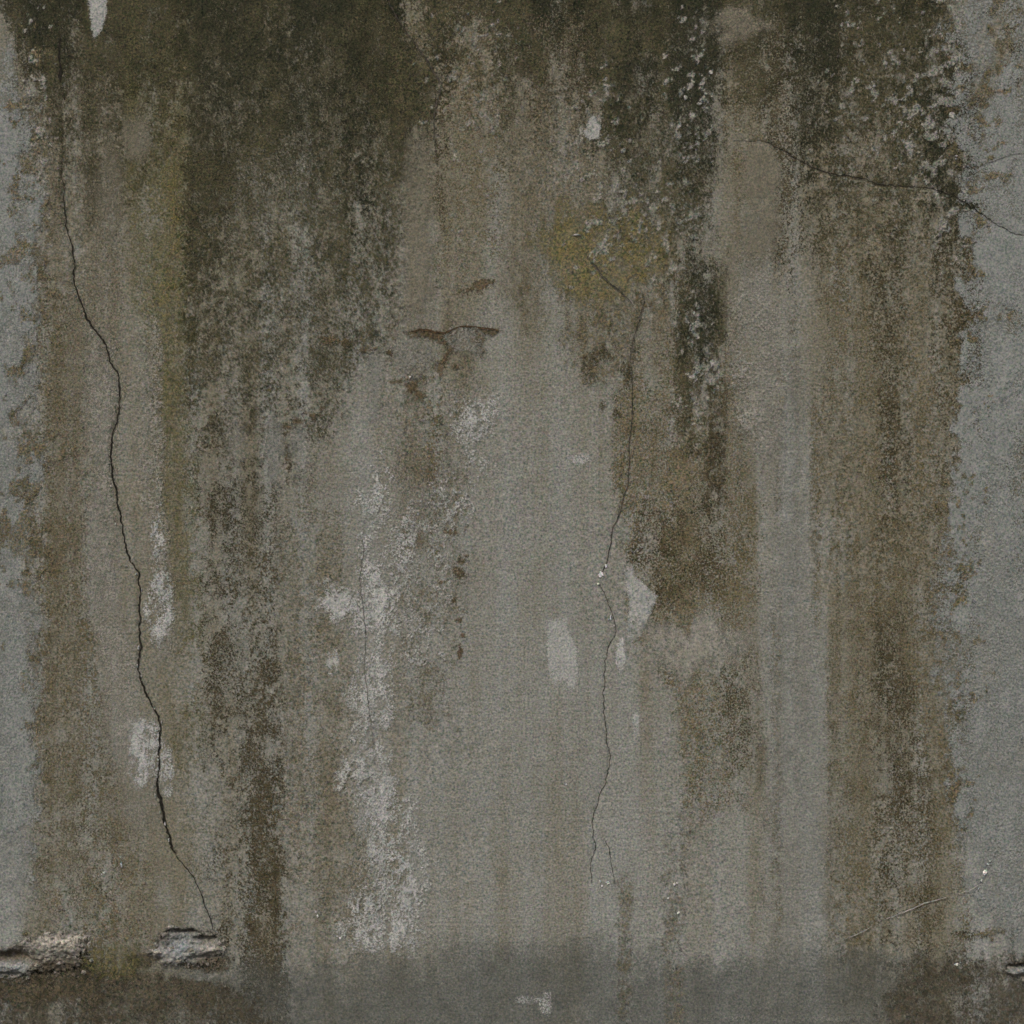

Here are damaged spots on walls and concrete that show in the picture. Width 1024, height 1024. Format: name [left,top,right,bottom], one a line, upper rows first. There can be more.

crack [734,140,1022,235]
corrosion [458,278,496,295]
corrosion [390,378,425,401]
corrosion [403,323,501,377]
crack [61,125,213,930]
water stain [0,0,500,1024]
crack [590,262,644,884]
water stain [386,0,1024,1024]
spalling [0,928,105,987]
spalling [145,920,239,973]